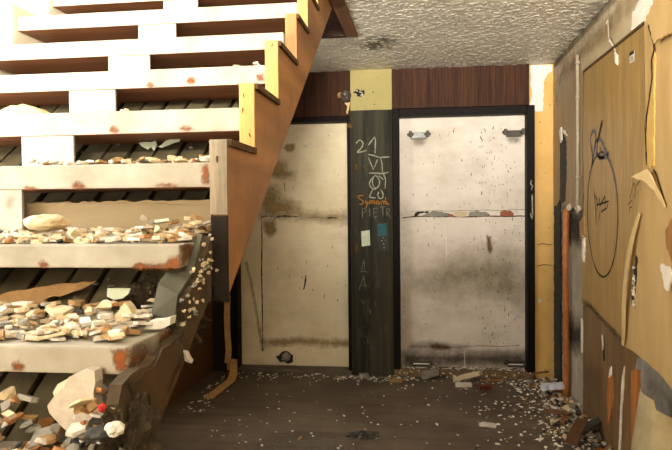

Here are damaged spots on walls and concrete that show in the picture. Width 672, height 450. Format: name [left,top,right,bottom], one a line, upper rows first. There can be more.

peeling [530,65,552,112]
crack [645,25,667,207]
leakage [272,163,291,177]
leakage [263,188,293,235]
rust [133,243,193,270]
rust [112,348,146,371]
spalling [276,351,293,364]
leakage [404,352,525,367]
flaking render [635,357,672,417]